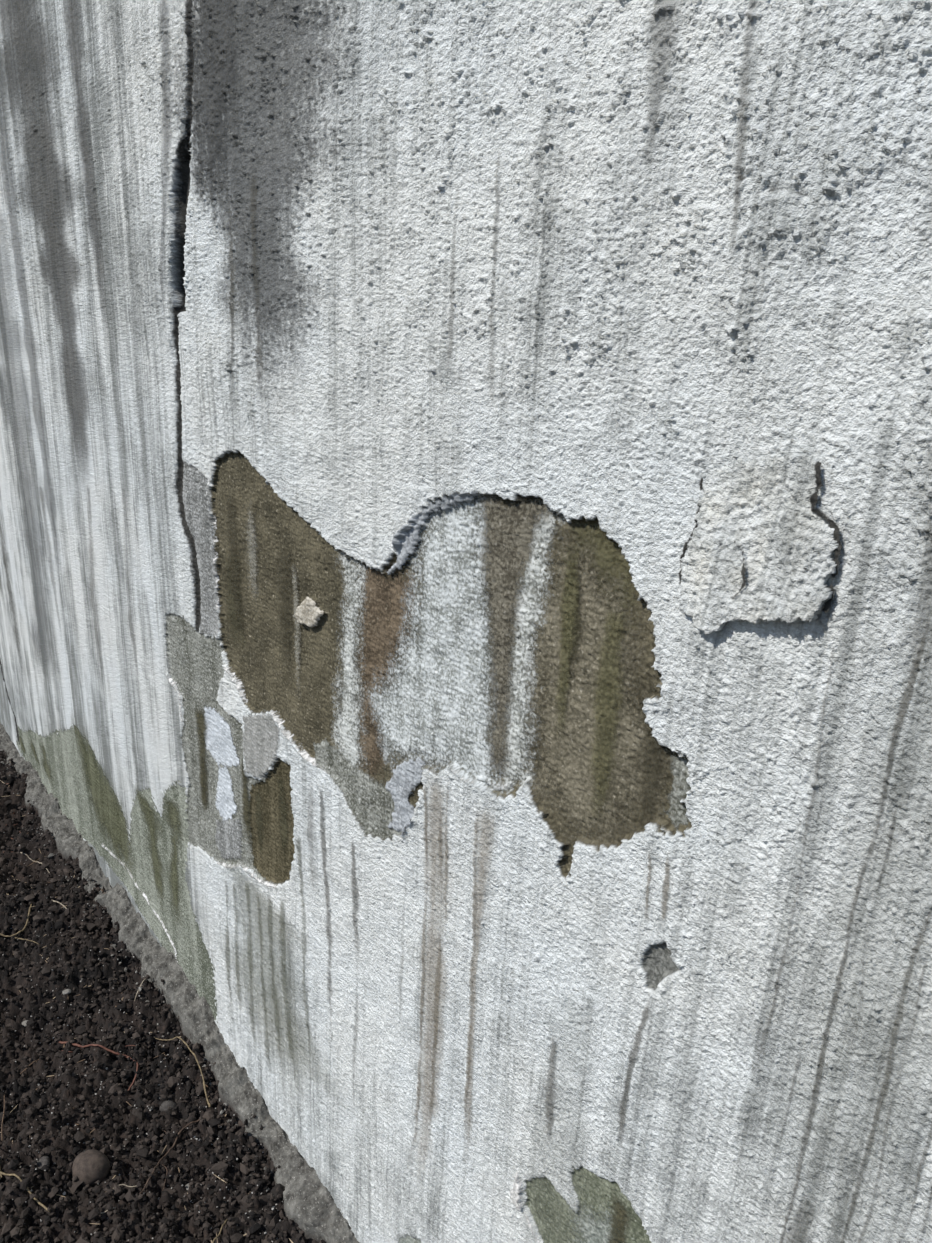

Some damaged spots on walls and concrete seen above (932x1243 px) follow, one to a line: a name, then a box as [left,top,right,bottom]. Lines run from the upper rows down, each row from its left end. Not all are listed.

damp [0,0,102,458]
crack [172,0,201,632]
damp [175,0,346,369]
spalling [16,451,692,1023]
peeling [510,1166,651,1243]